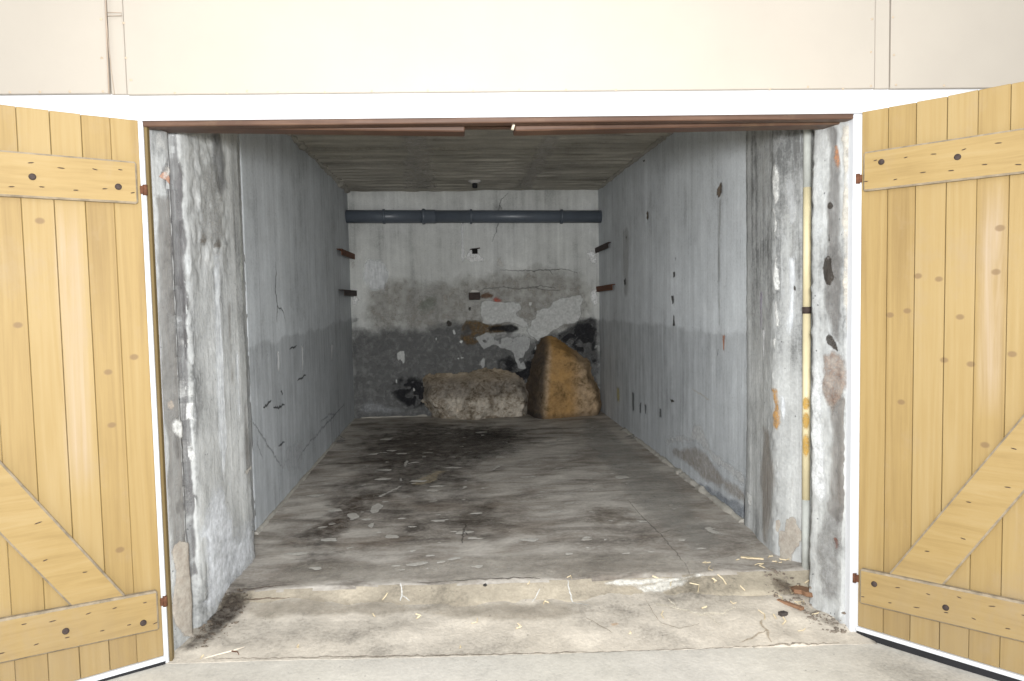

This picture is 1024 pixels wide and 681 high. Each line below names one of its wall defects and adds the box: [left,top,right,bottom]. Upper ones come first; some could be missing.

damp [214,134,225,191]
peeling [828,189,848,235]
spalling [823,256,848,305]
damp [352,273,601,418]
flaking render [469,295,583,369]
flaking render [775,517,802,561]